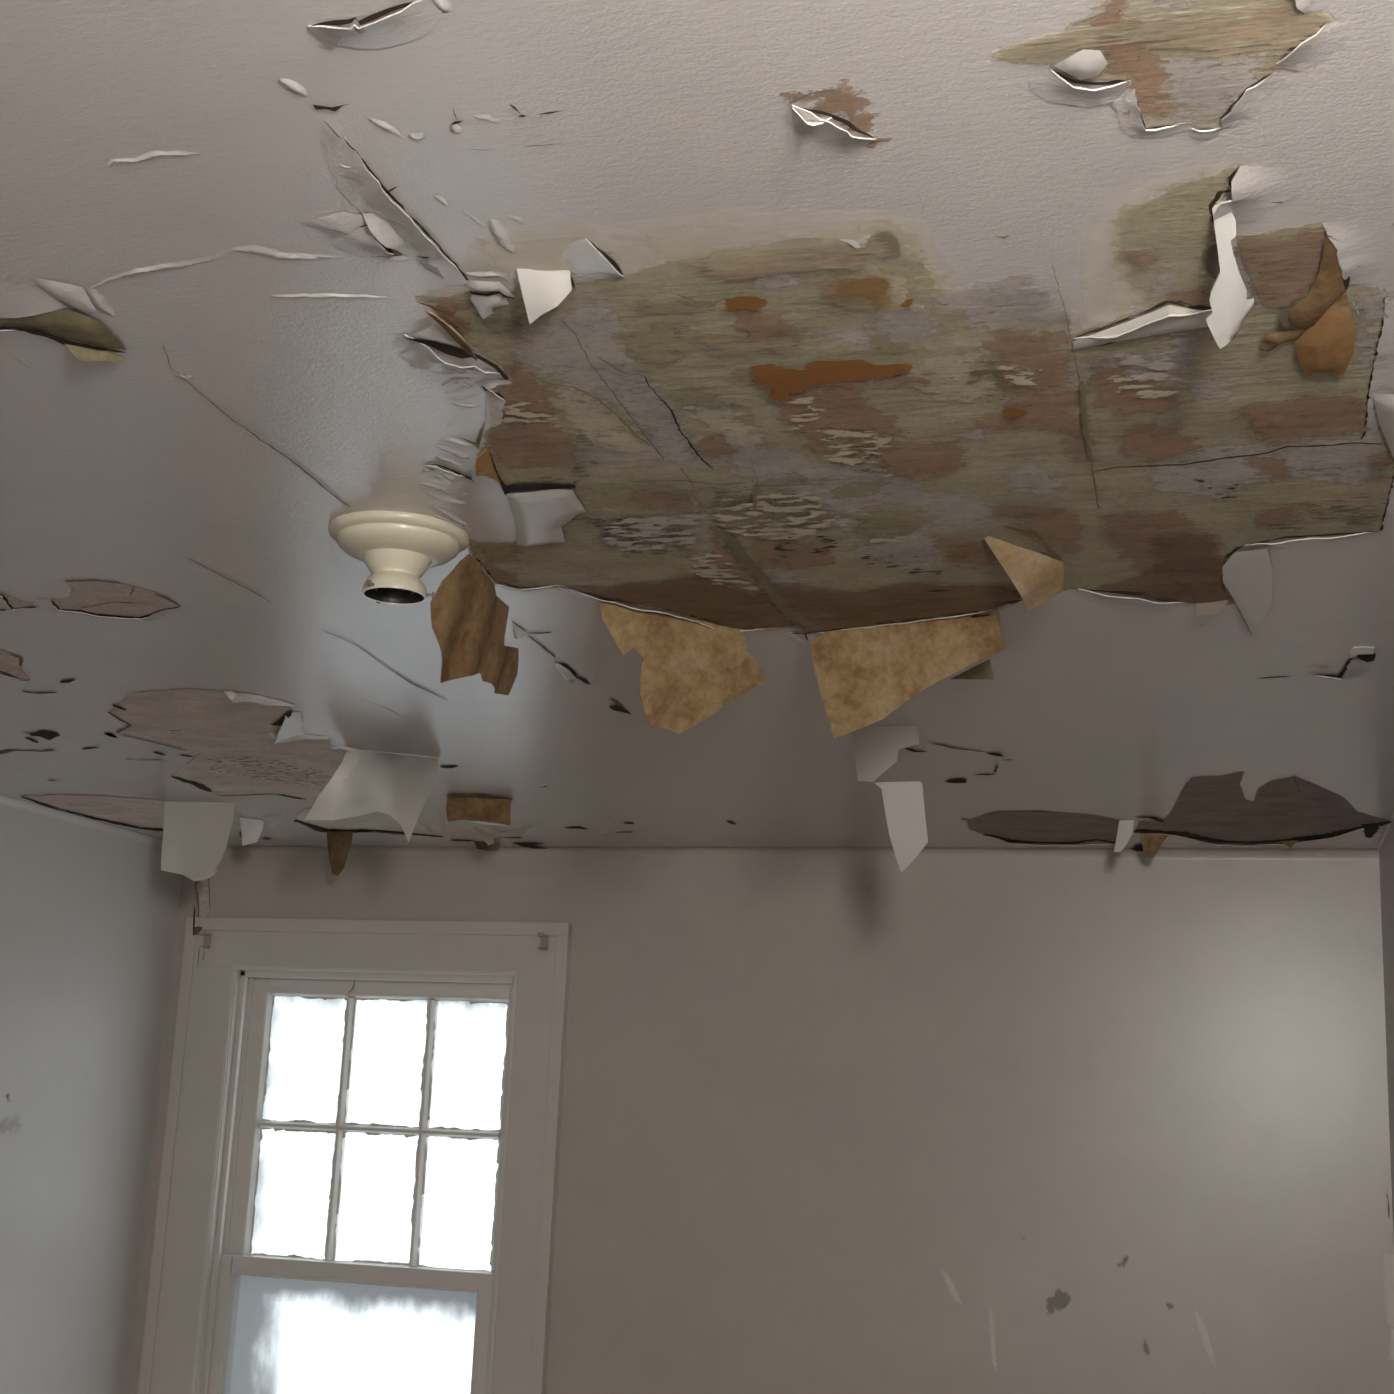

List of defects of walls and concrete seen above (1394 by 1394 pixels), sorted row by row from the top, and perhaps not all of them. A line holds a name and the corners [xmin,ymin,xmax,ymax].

peeling [780,79,889,148]
peeling [993,0,1353,139]
peeling [0,277,127,369]
crack [163,346,352,508]
peeling [392,163,1394,872]
peeling [0,650,30,681]
peeling [0,579,188,621]
peeling [20,689,538,881]